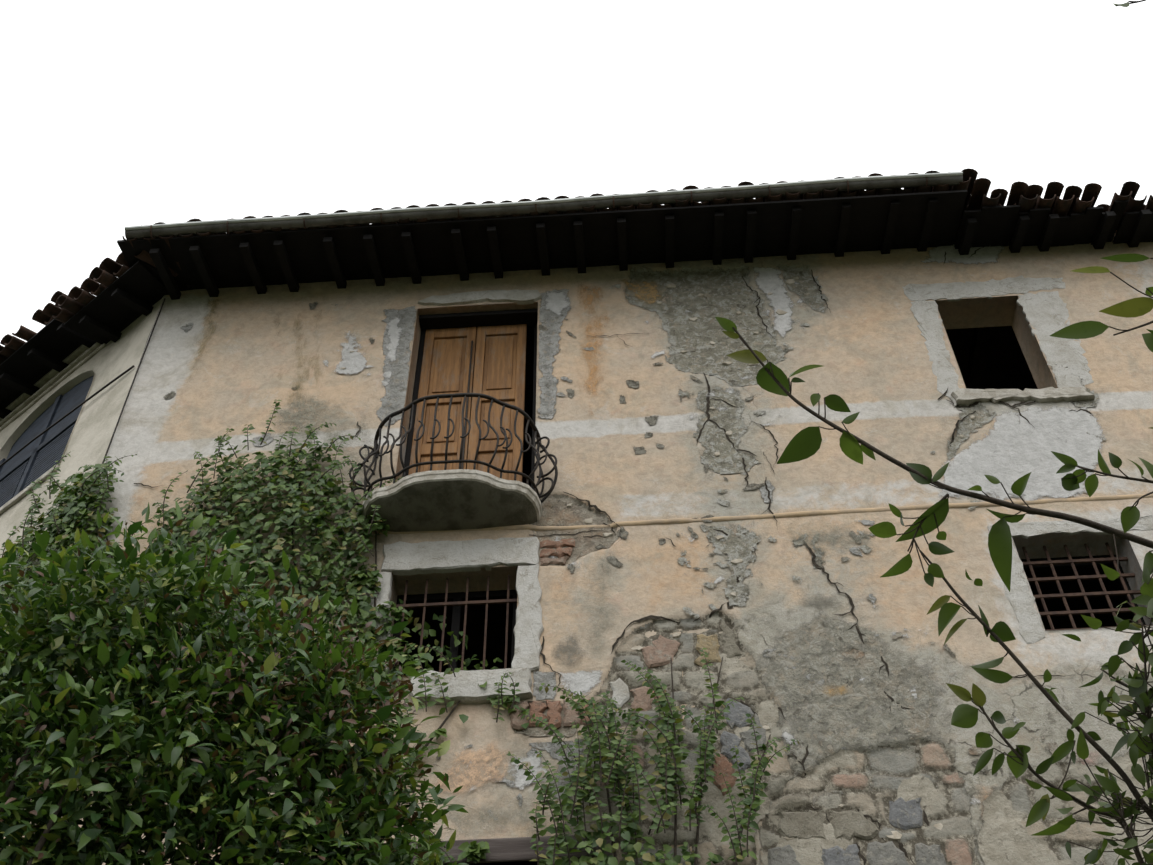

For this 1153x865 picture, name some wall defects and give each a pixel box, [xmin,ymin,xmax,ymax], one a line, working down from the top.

crack [697,373,778,529]
crack [611,603,725,653]
flaking render [508,264,1153,865]
crack [803,540,911,711]